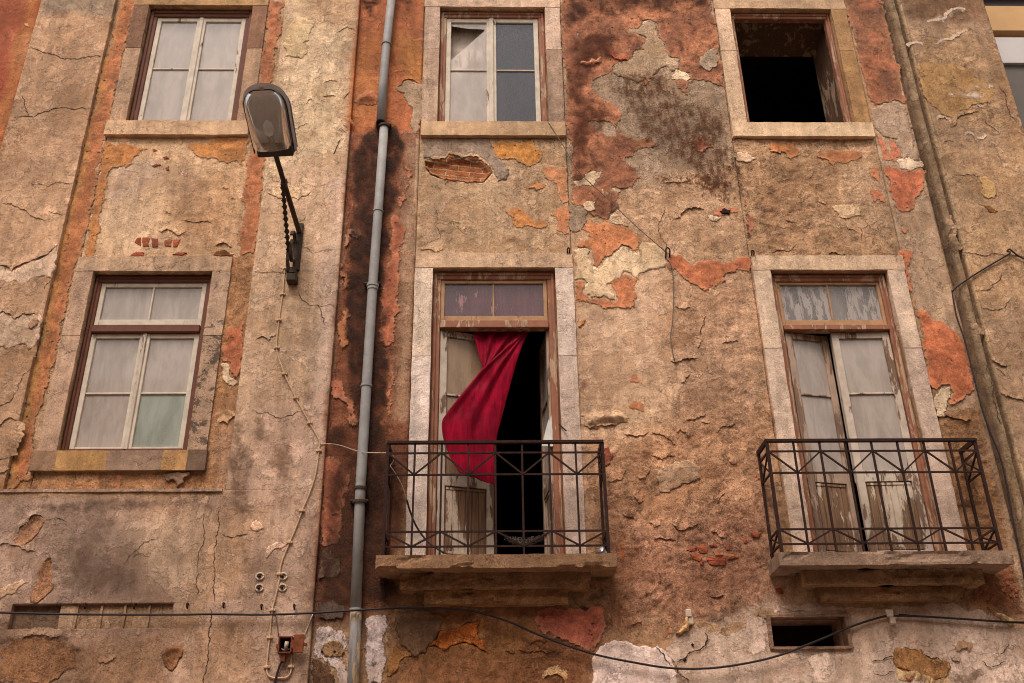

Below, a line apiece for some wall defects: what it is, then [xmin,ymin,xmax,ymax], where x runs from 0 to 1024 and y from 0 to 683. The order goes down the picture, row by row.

crack [13,96,91,118]
peeling [0,0,169,489]
flaking render [130,225,189,256]
peeling [425,0,756,309]
damp [613,68,751,239]
peeling [844,0,966,212]
damp [320,124,404,602]
peeling [898,249,975,422]
flaking render [0,508,62,604]
crack [196,506,246,683]
peeling [311,626,348,683]
flaking render [527,588,1024,683]